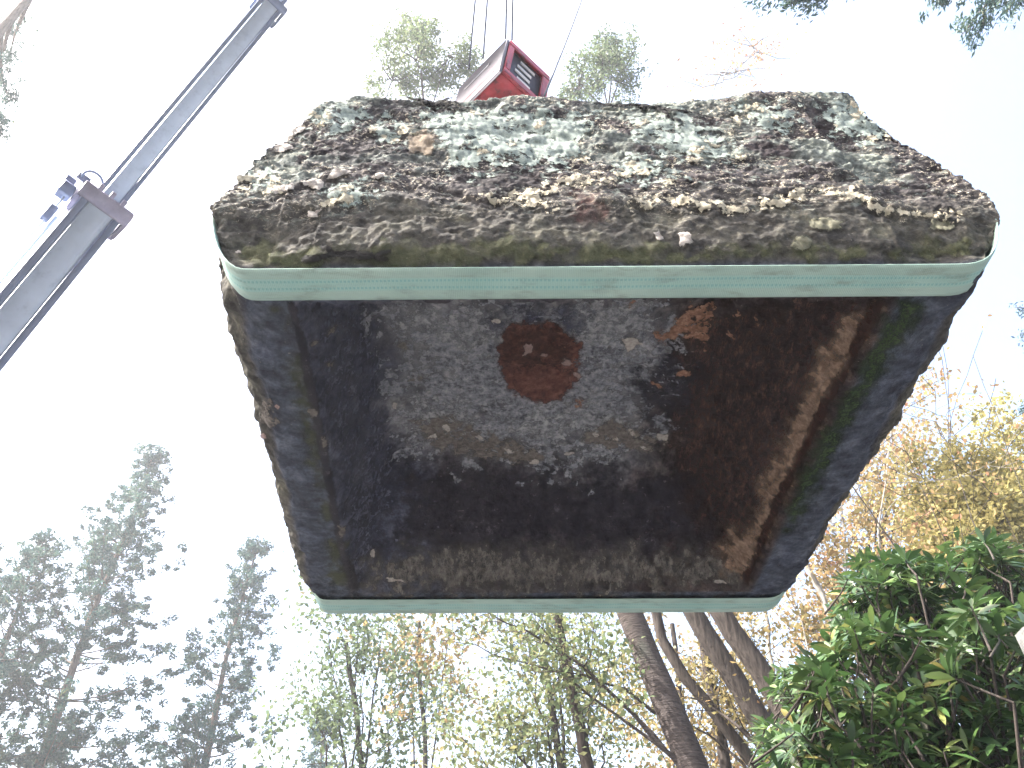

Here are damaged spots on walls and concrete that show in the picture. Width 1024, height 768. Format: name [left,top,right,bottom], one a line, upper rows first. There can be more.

rust [496,320,586,404]
leakage [308,297,885,600]